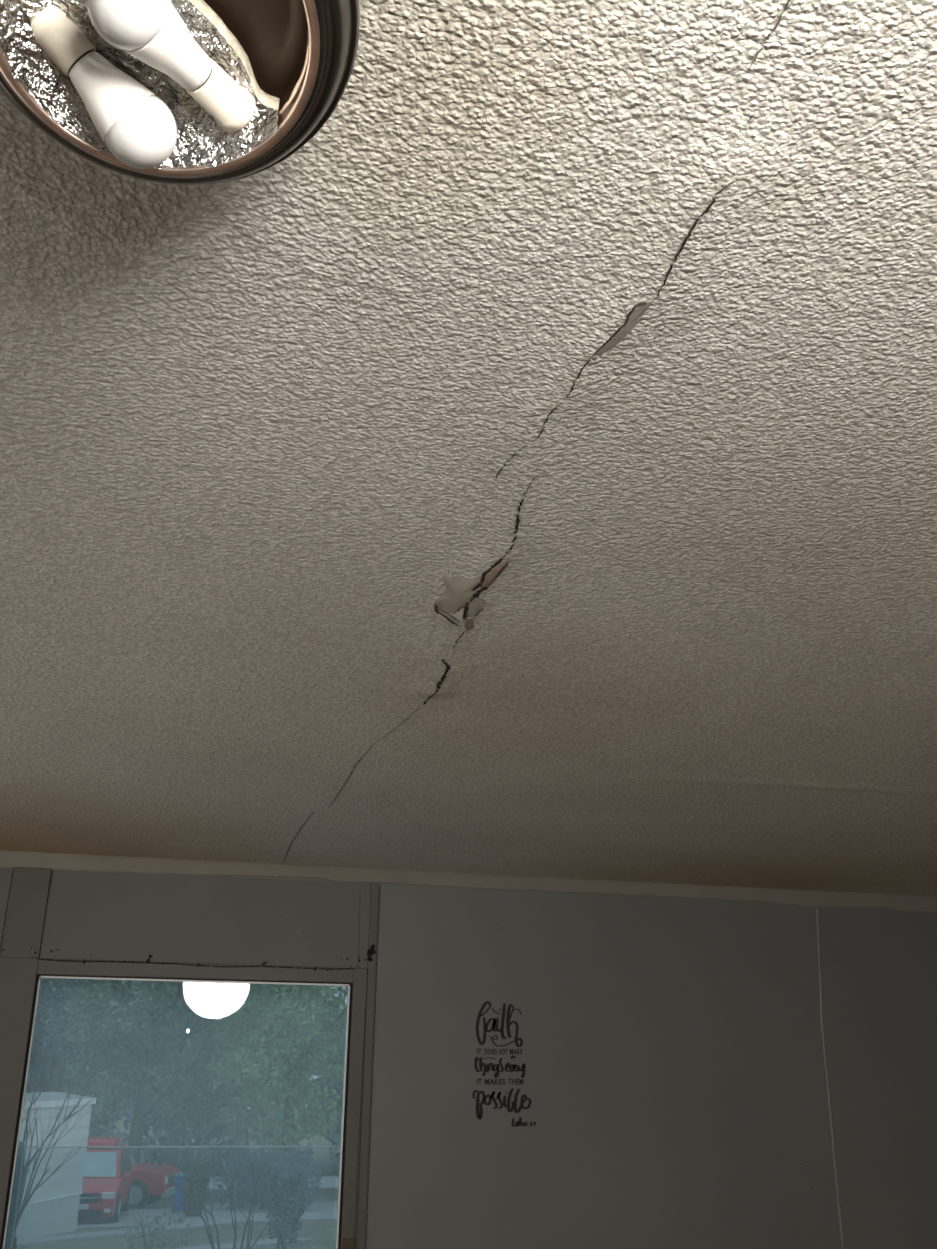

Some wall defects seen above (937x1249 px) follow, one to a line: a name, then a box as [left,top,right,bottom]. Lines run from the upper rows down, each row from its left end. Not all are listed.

crack [747,0,790,71]
crack [653,181,734,302]
spalling [593,301,653,356]
crack [283,356,592,861]
peeling [434,559,509,631]